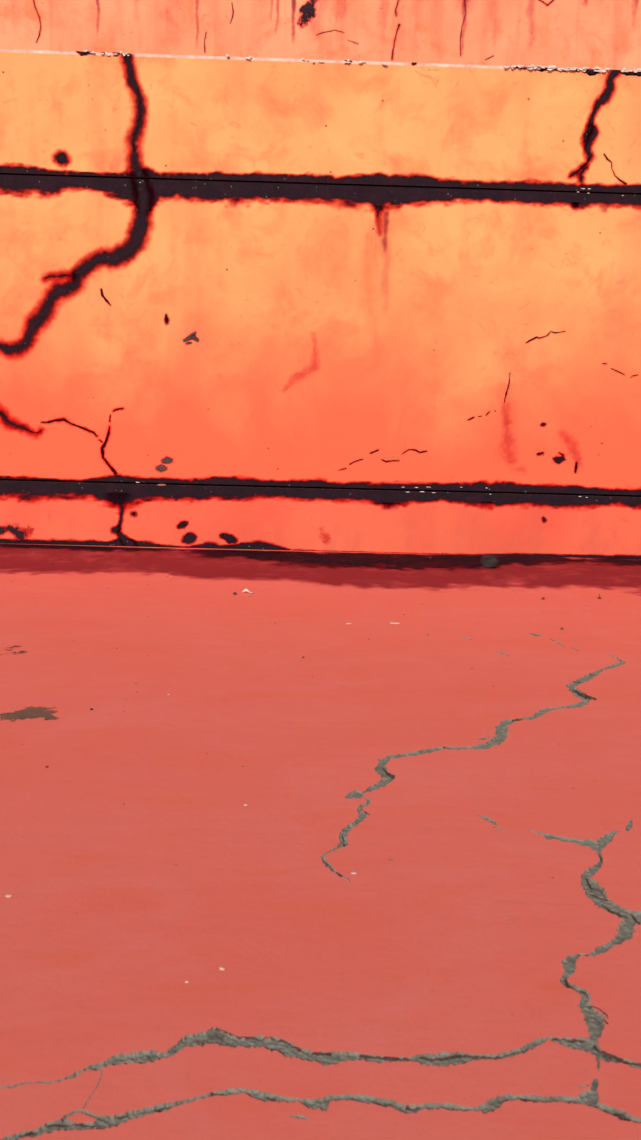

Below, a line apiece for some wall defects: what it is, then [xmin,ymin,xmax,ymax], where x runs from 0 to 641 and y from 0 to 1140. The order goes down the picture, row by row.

water stain [293,0,315,26]
crack [569,70,627,185]
crack [0,53,153,357]
water stain [0,164,641,226]
crack [0,408,124,475]
crack [111,504,136,547]
water stain [0,475,641,509]
crack [321,633,625,882]
crack [0,815,641,1140]